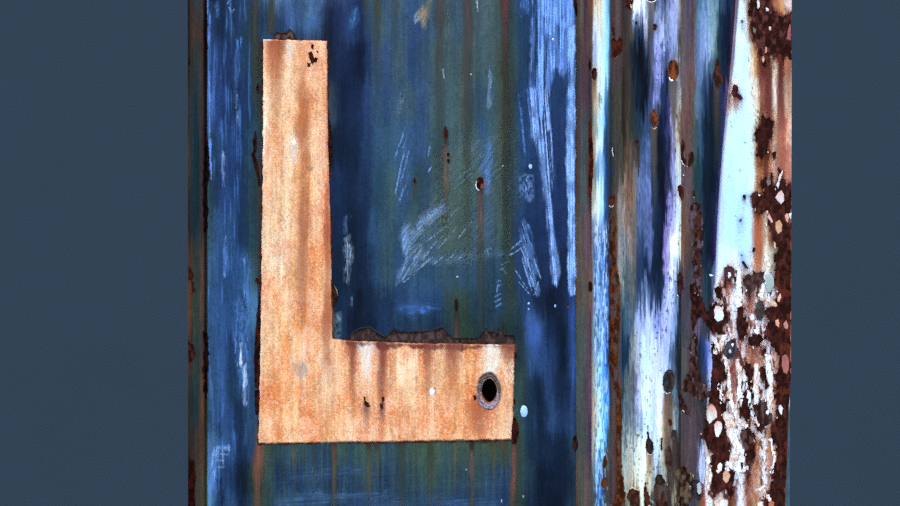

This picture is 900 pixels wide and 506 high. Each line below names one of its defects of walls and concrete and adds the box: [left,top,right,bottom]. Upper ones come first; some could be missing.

corrosion [437,0,450,203]
corrosion [253,0,281,298]
corrosion [299,202,307,280]
corrosion [324,284,338,334]
corrosion [347,299,513,385]
corrosion [475,176,485,256]
corrosion [601,0,792,506]
peeling [714,306,724,322]
peeling [728,267,743,308]
peeling [758,252,781,307]
peeling [697,334,789,494]
peeling [755,486,774,506]